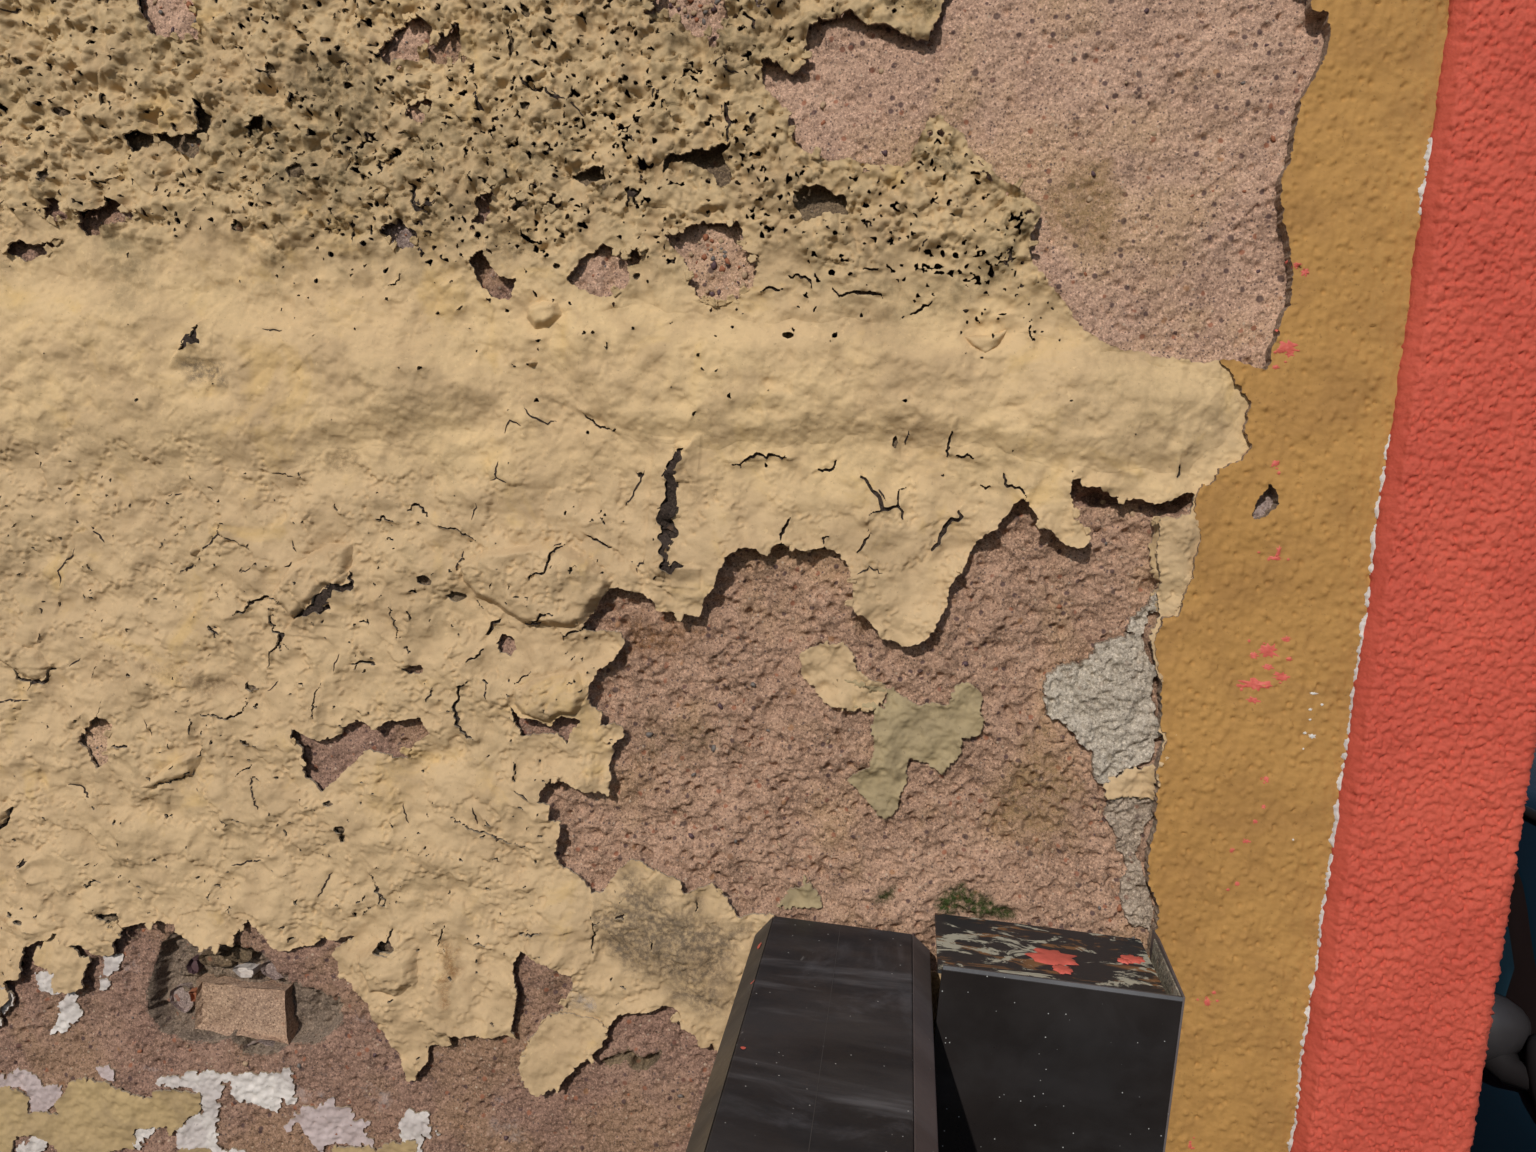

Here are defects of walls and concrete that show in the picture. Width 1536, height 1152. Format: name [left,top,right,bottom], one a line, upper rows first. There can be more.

peeling [379,12,466,85]
peeling [0,169,149,262]
peeling [128,103,279,158]
peeling [470,249,516,303]
peeling [554,219,759,312]
peeling [663,113,756,187]
peeling [756,0,1324,369]
crack [732,452,906,574]
crack [931,431,1027,551]
crack [425,448,684,738]
peeling [538,471,1193,971]
peeling [0,912,718,1152]